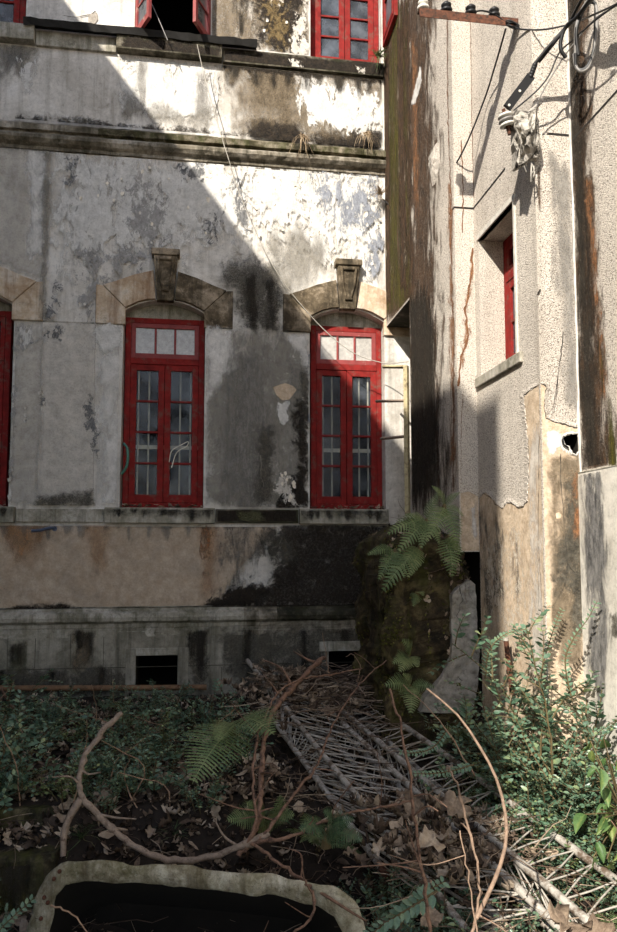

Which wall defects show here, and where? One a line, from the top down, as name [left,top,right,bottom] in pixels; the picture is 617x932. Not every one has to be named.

peeling [13,151,384,371]
damp [15,0,413,320]
crack [446,26,474,445]
rust [568,0,617,470]
damp [35,490,95,506]
peeling [82,394,102,461]
damp [99,348,138,533]
peeling [273,471,299,506]
peeling [272,334,310,427]
damp [204,223,387,607]
spalling [461,381,586,771]